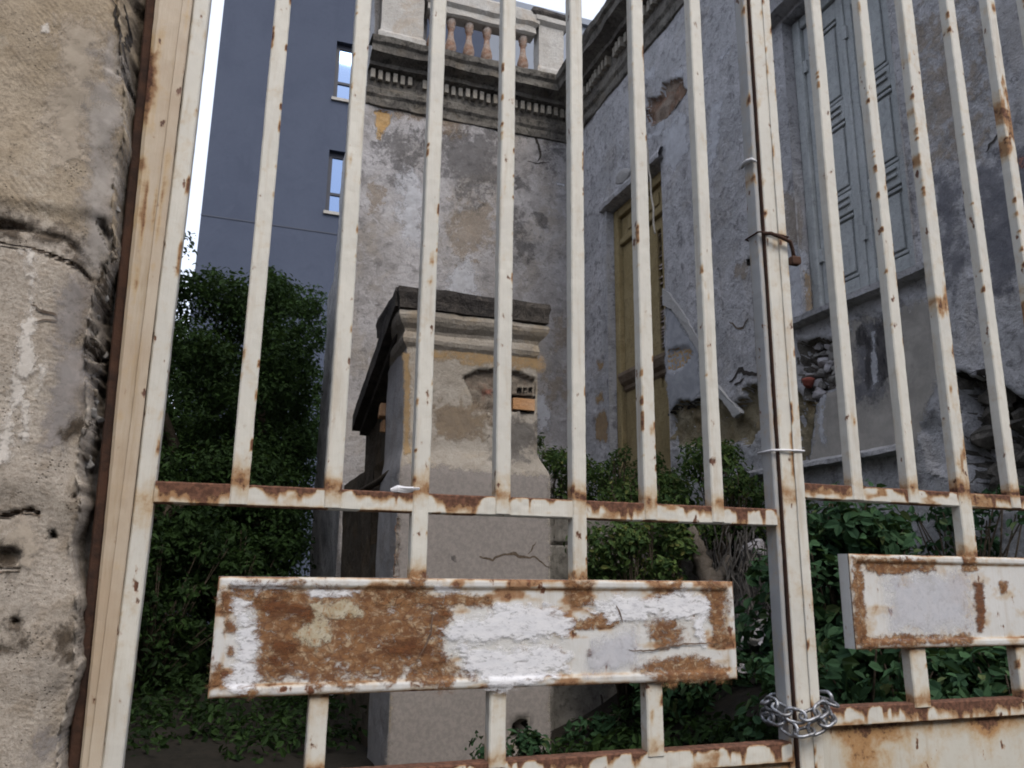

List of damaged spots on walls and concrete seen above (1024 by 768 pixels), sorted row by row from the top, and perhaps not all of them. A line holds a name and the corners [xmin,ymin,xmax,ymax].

spalling [646,77,687,126]
crack [0,241,92,282]
spalling [0,0,146,768]
spalling [464,369,493,412]
spalling [511,371,536,414]
spalling [797,337,836,461]
spalling [956,369,1001,494]
spalling [1005,386,1024,496]
crack [479,543,550,568]